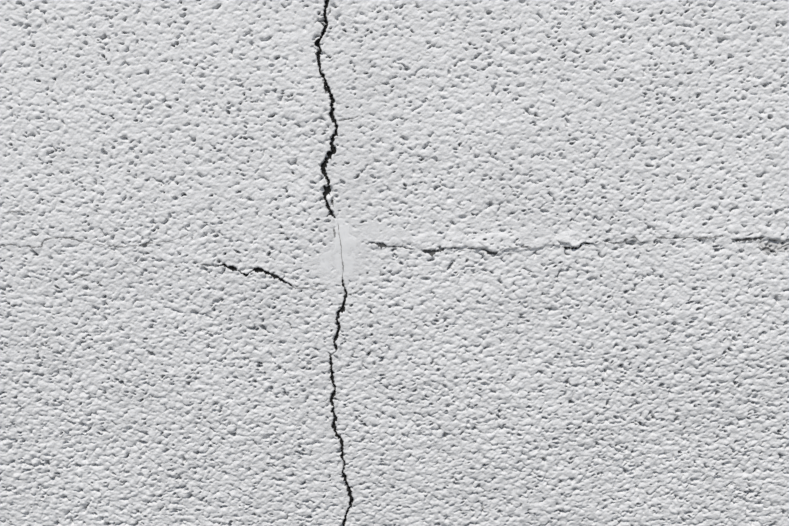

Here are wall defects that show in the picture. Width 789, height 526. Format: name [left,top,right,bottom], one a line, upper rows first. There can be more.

crack [0,234,187,248]
crack [370,242,531,257]
crack [564,235,789,253]